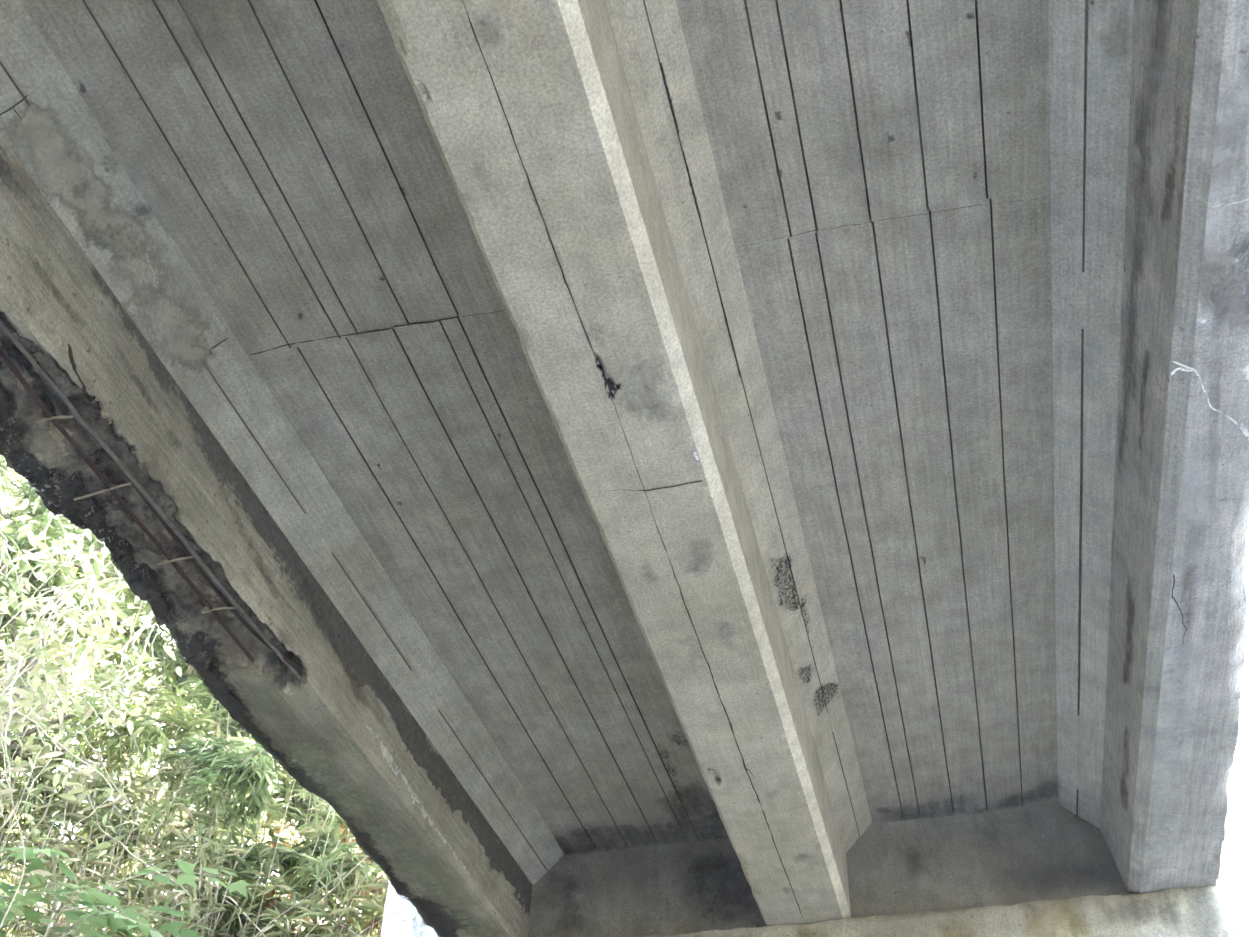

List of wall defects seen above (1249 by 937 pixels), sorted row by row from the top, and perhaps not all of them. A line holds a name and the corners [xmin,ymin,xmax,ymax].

crack [462,0,595,356]
spalling [0,311,307,689]
crack [596,401,804,920]
crack [1171,361,1249,448]